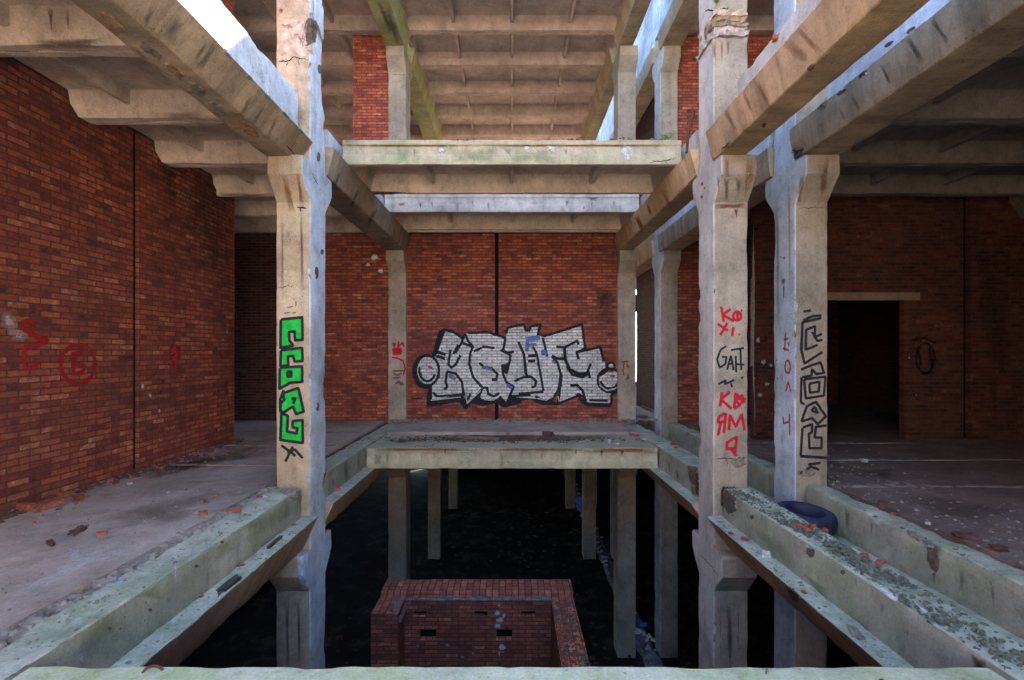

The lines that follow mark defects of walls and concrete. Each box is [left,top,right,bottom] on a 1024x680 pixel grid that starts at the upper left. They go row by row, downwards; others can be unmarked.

spalling [280,15,318,61]
spalling [721,487,737,514]
flaking render [297,549,309,591]